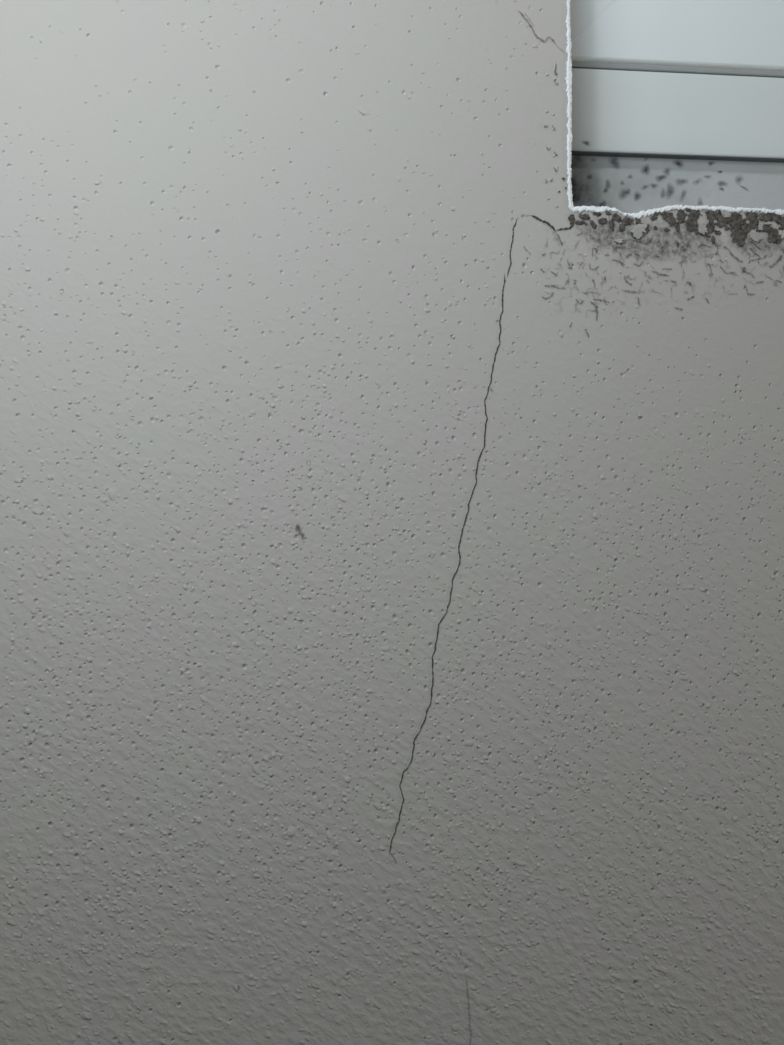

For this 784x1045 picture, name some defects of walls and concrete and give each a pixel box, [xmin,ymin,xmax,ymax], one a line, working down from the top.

crack [389,215,651,853]